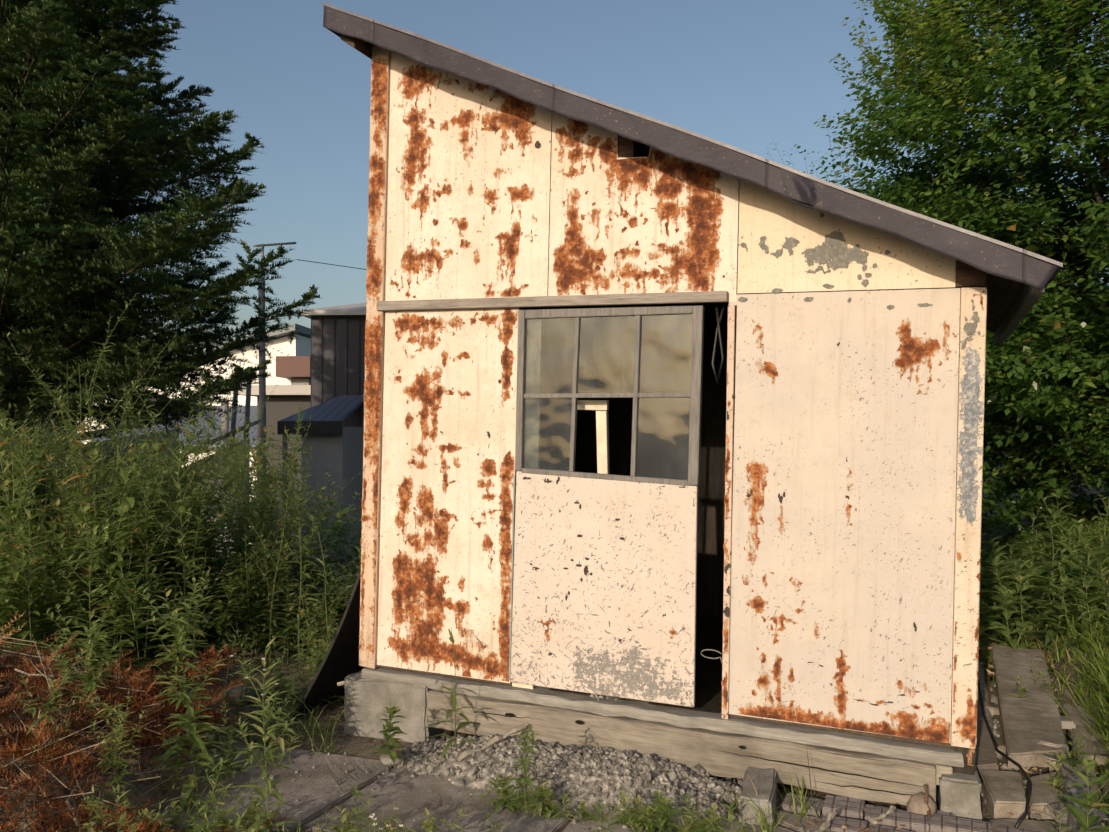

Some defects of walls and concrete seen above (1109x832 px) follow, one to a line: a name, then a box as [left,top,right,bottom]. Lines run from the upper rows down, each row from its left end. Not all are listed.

corrosion [549,114,725,295]
peeling [738,229,878,289]
corrosion [359,57,537,682]
corrosion [895,320,957,395]
peeling [957,299,984,525]
peeling [569,644,692,706]
corrosion [721,460,979,766]